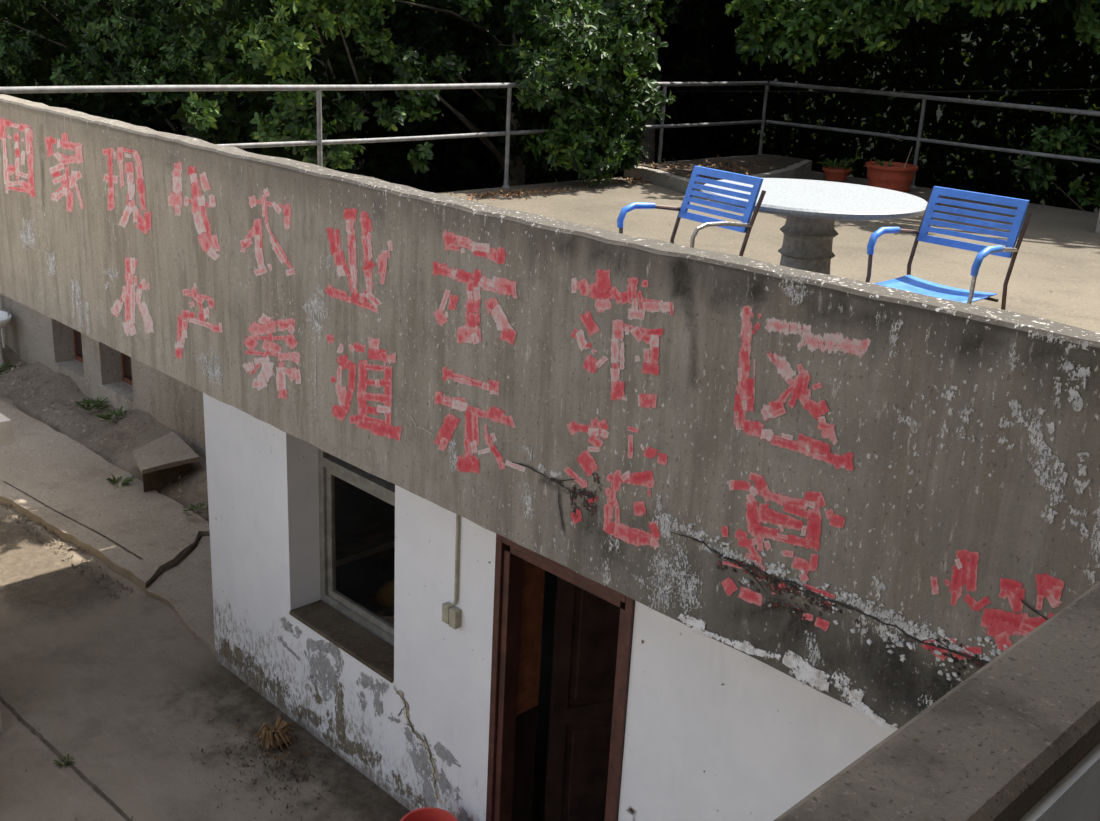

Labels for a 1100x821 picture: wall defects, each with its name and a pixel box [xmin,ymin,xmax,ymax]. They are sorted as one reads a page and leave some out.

crack [510,461,597,535]
spalling [652,494,985,669]
crack [667,516,1008,682]
crack [1020,598,1048,620]
peeling [678,613,898,729]
peeling [354,669,473,821]
crack [393,685,442,805]